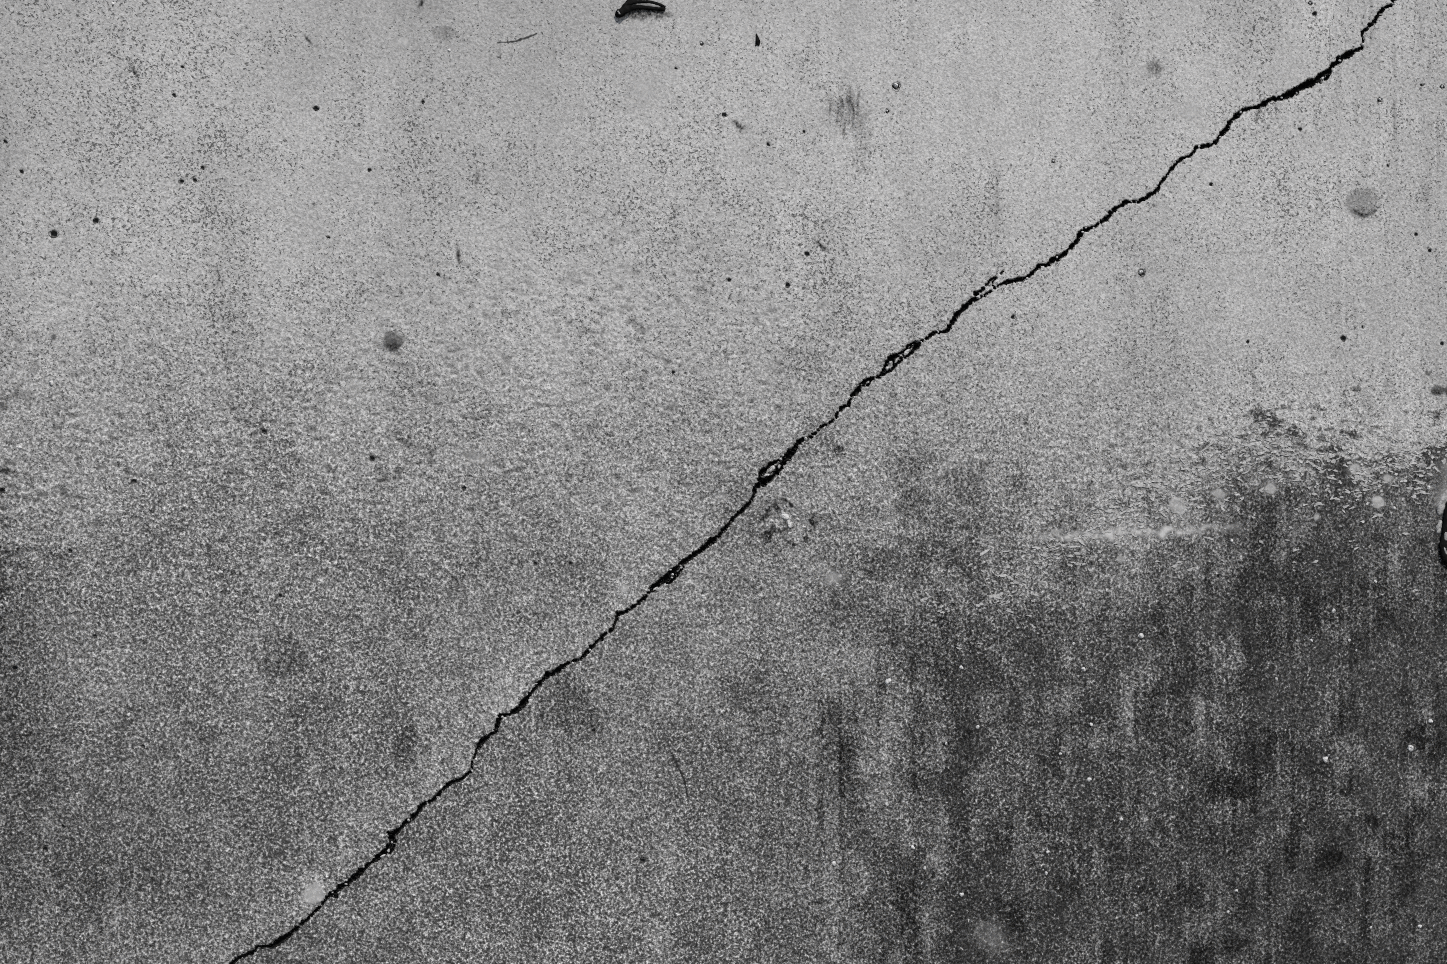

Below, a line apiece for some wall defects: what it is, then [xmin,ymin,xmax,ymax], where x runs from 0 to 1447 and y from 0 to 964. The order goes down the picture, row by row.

crack [995,0,1396,287]
crack [231,277,997,964]
water stain [0,405,1447,964]